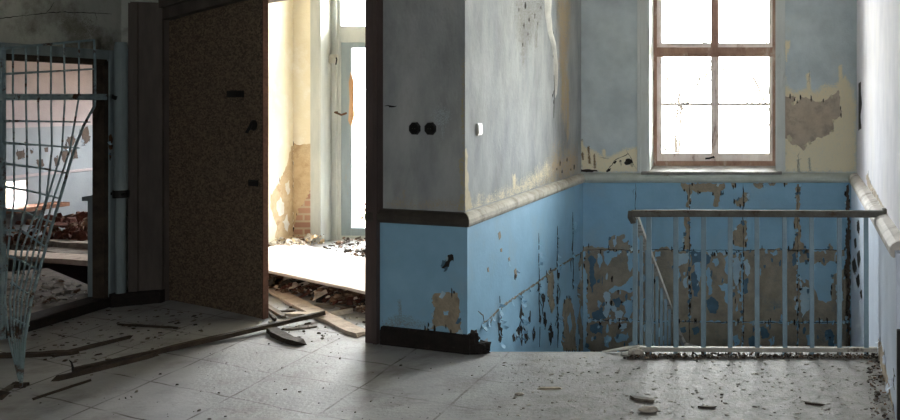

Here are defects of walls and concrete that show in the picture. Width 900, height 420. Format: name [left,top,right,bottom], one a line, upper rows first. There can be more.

flaking render [785,90,842,151]
peeling [556,140,637,173]
flaking render [270,142,310,241]
peeling [441,254,454,272]
peeling [512,183,862,356]
peeling [424,288,463,334]